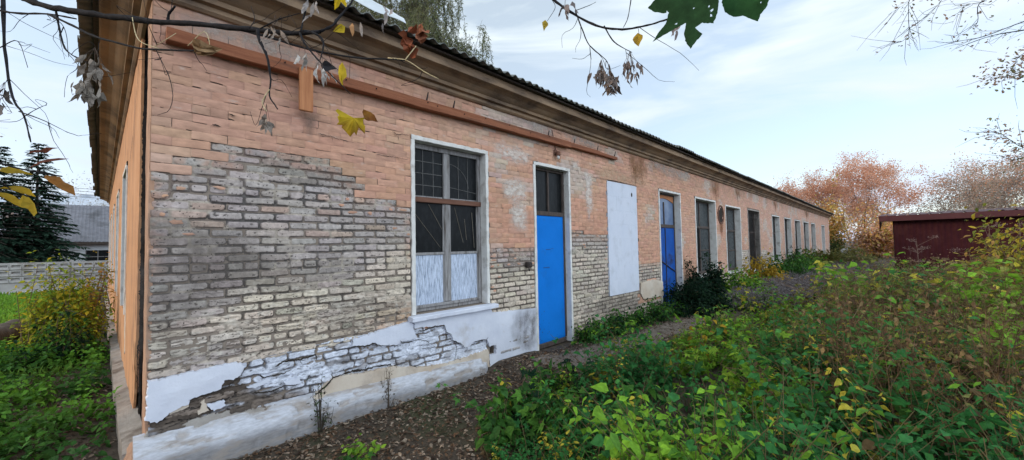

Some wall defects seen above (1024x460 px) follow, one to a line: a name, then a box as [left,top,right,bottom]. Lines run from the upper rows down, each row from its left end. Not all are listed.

peeling [144,143,488,438]